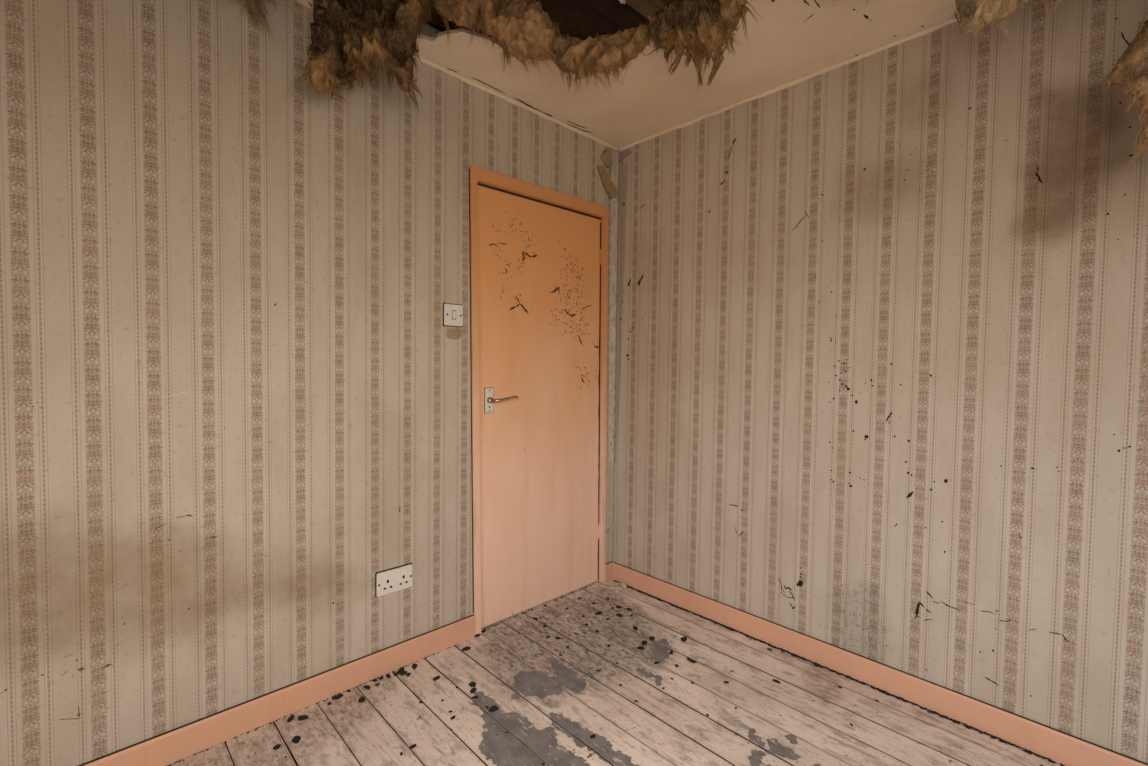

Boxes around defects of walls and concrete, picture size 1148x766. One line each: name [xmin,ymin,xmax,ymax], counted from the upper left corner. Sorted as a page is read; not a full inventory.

peeling [637,639,671,686]
peeling [469,658,639,766]
peeling [747,728,801,766]